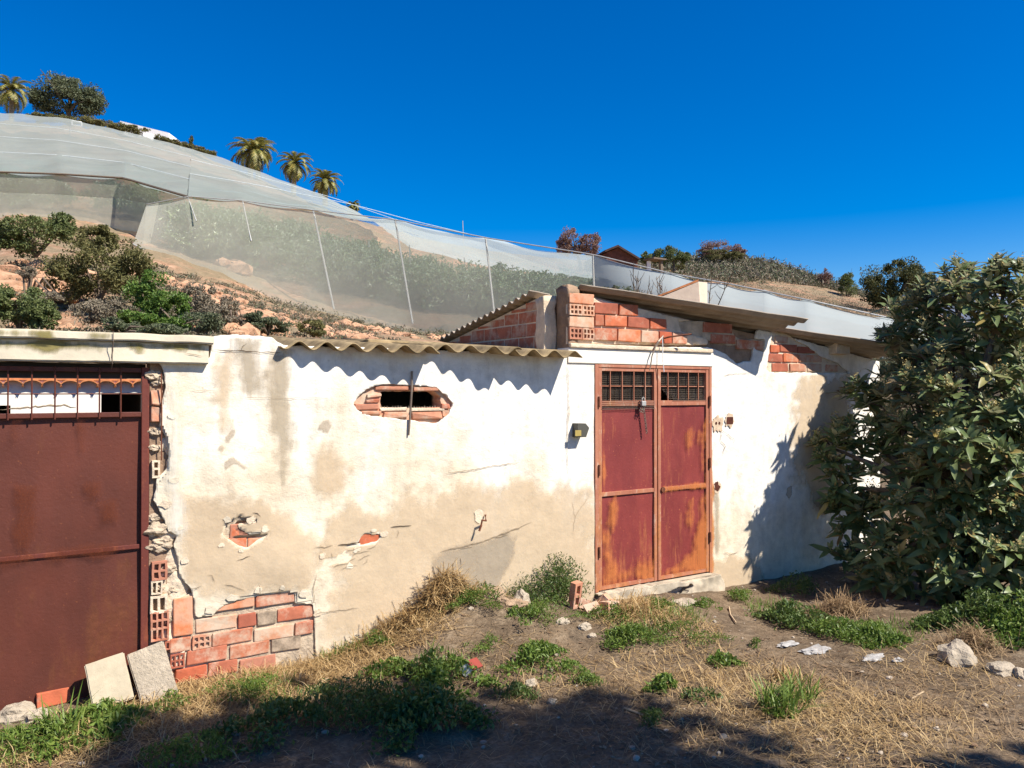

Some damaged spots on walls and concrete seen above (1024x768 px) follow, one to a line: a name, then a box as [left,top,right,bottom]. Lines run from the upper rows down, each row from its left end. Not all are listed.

spalling [566,293,847,373]
spalling [145,370,180,483]
leakage [215,338,289,471]
spalling [143,500,322,684]
spalling [346,529,388,569]
leakage [169,391,595,632]
corrosion [603,501,652,582]
corrosion [665,478,714,572]